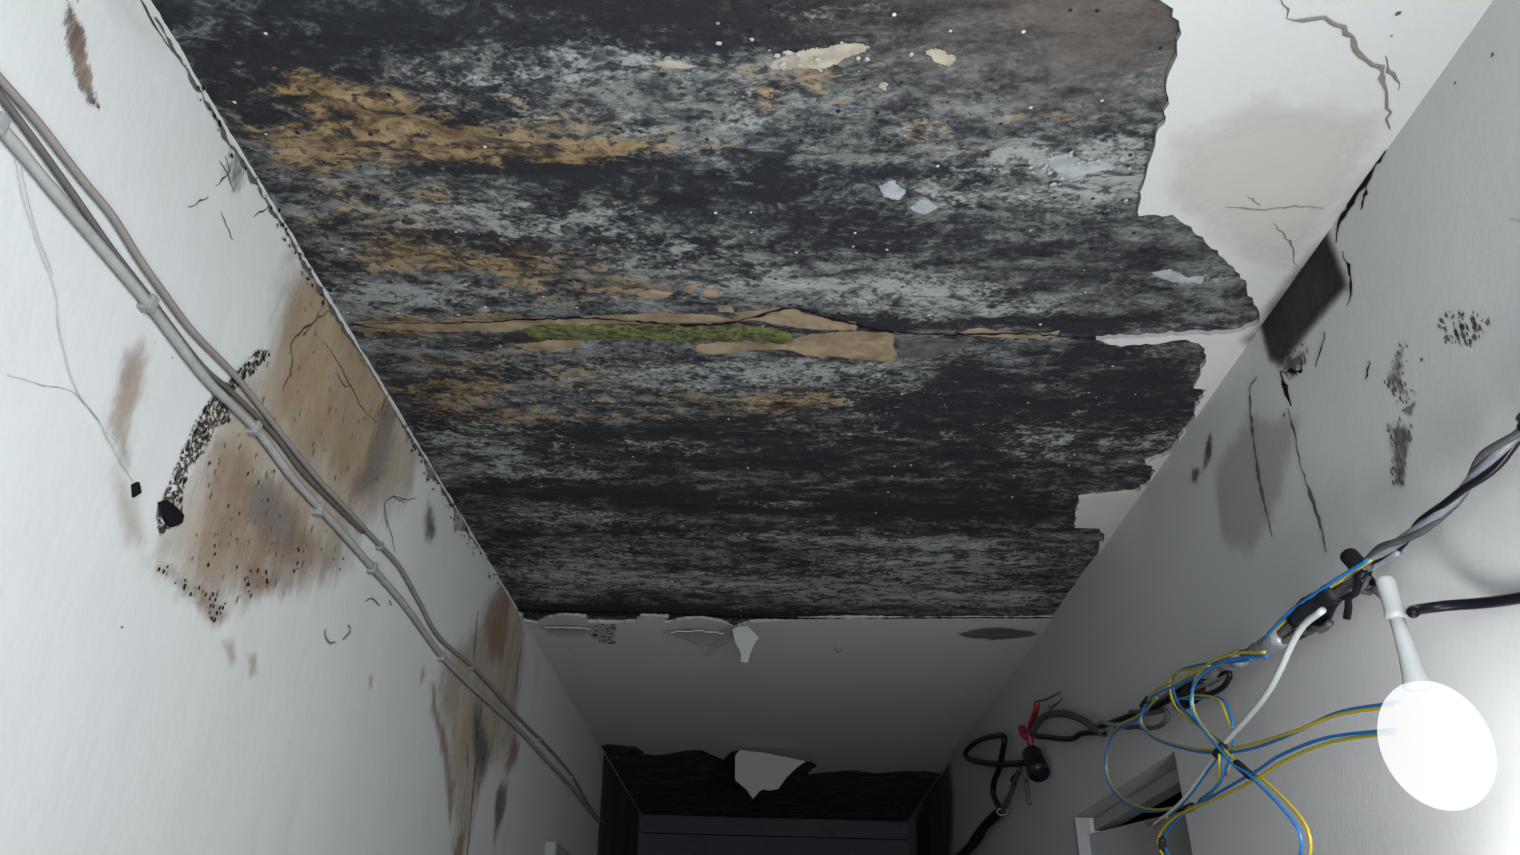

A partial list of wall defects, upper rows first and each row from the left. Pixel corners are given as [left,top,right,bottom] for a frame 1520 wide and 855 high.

crack [1281,0,1400,129]
peeling [151,0,1346,644]
leakage [115,357,141,438]
leakage [131,482,142,498]
leakage [156,279,418,622]
leakage [421,589,522,855]
peeling [601,744,941,822]